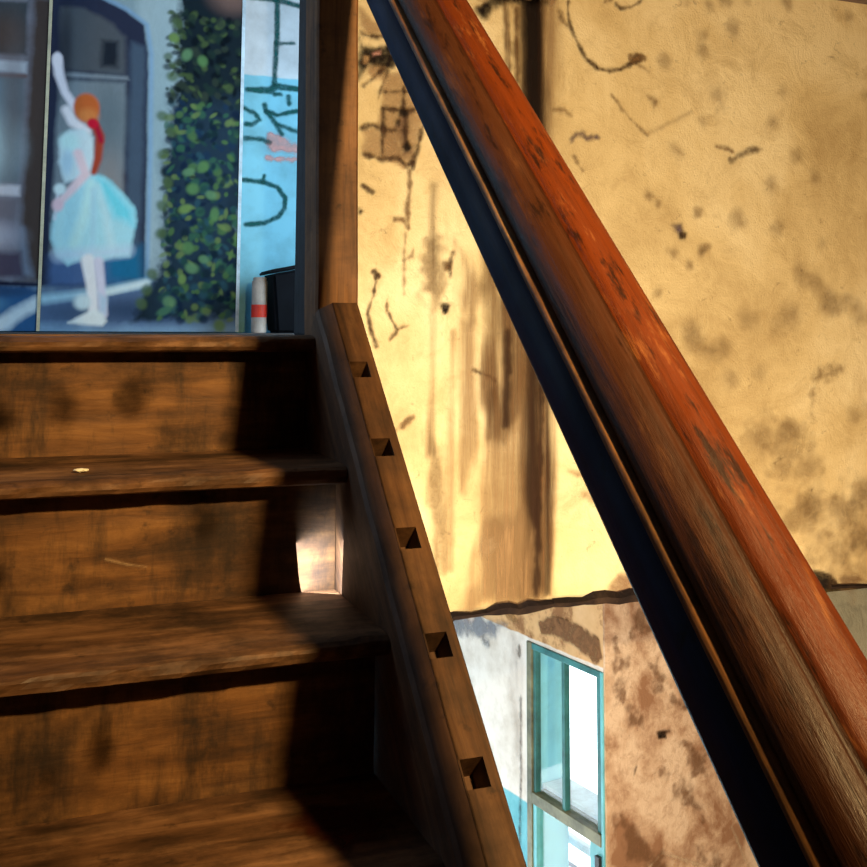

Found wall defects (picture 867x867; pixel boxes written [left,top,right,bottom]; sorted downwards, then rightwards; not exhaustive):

leakage [505,0,554,130]
leakage [453,270,555,637]